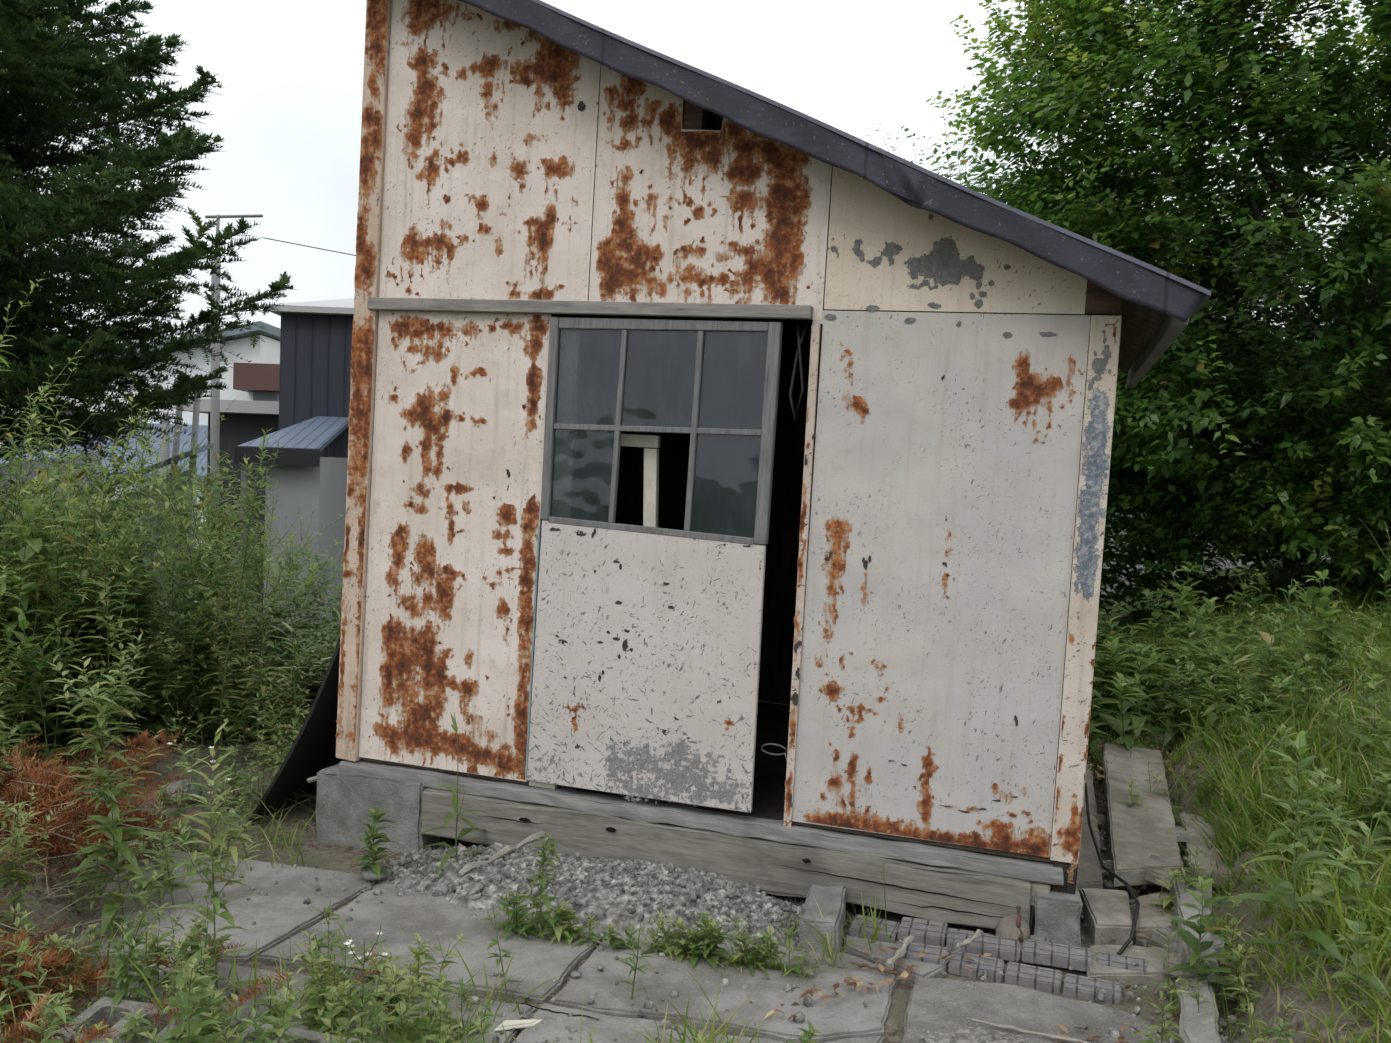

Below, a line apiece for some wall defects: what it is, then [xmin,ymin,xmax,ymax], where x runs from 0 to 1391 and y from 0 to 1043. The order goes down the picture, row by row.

corrosion [336,0,581,780]
corrosion [596,69,812,305]
corrosion [796,483,807,588]
peeling [828,236,1011,309]
corrosion [1009,351,1083,443]
peeling [1072,330,1112,603]
peeling [599,736,750,811]
corrosion [784,518,1091,883]